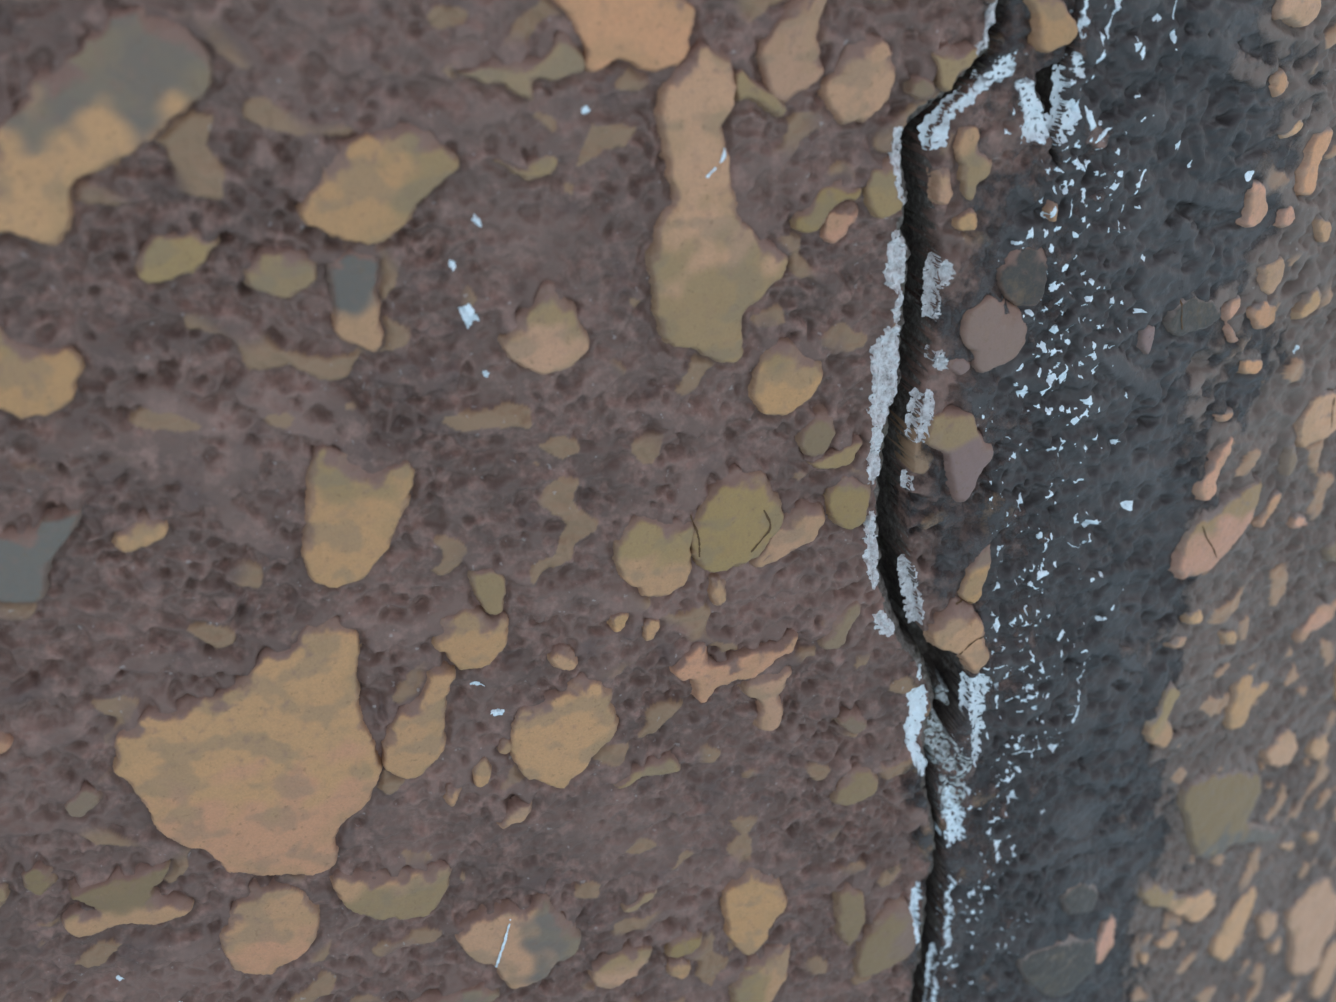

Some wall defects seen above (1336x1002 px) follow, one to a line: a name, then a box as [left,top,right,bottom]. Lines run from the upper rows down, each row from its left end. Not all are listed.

crack [862,0,1010,1002]
crack [1034,0,1088,164]
leakage [888,0,1324,1002]